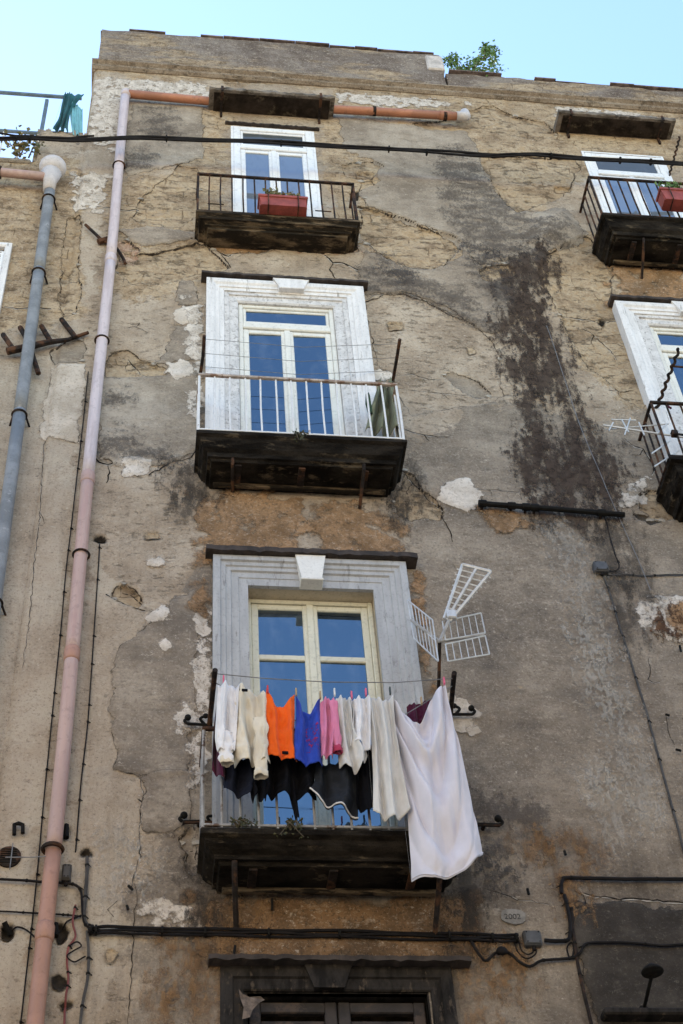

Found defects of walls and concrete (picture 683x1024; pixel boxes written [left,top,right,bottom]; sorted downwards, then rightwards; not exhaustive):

spalling [57,171,113,317]
crack [318,214,459,315]
spalling [104,350,166,378]
peeling [179,295,206,419]
spalling [111,581,143,608]
peeling [173,597,213,789]
peeling [136,825,204,927]
crack [575,890,683,904]